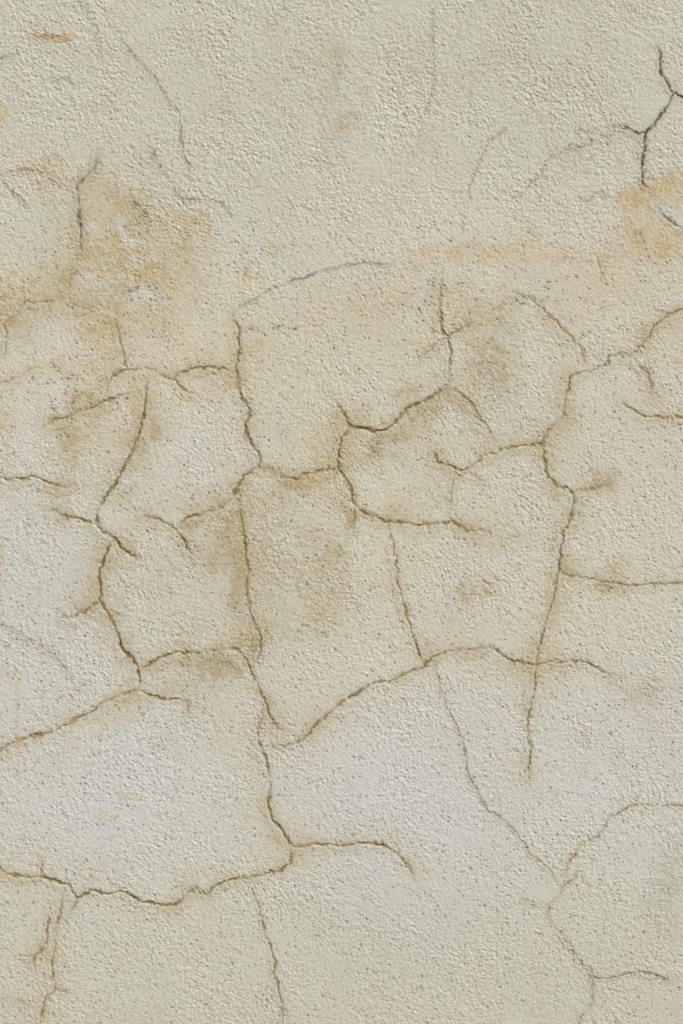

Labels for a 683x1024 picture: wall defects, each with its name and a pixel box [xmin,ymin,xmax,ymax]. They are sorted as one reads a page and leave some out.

crack [0,150,103,391]
crack [0,0,233,218]
crack [425,8,437,114]
crack [460,125,509,236]
crack [510,45,683,232]
crack [0,260,683,1024]